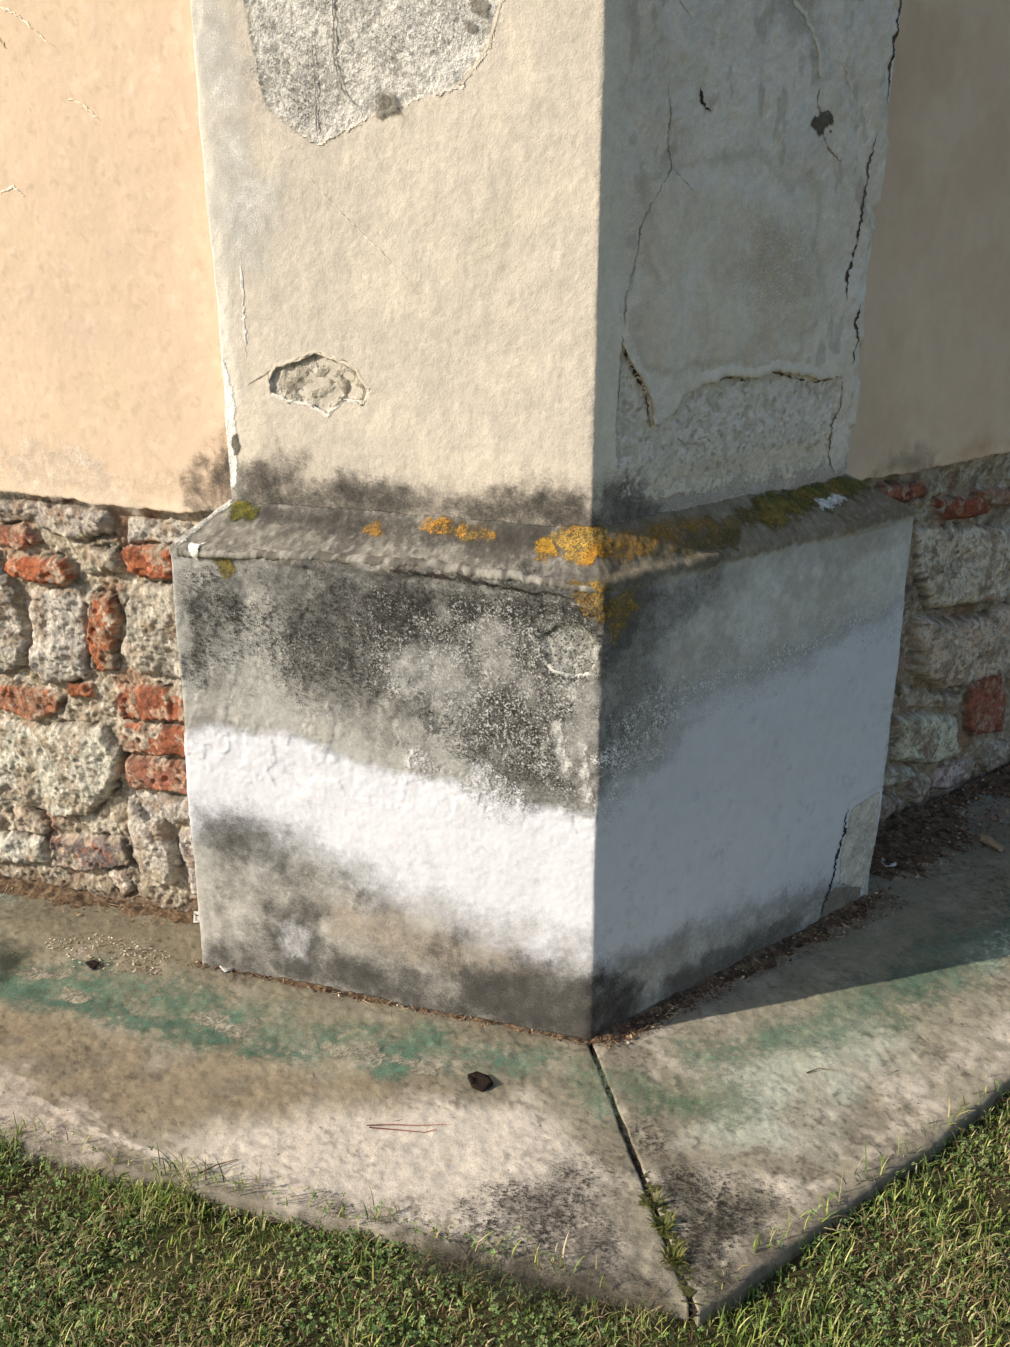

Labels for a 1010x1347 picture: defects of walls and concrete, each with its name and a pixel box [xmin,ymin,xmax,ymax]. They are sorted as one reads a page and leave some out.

spalling [243,0,505,145]
crack [887,0,902,105]
crack [624,84,711,327]
crack [845,135,877,363]
spalling [173,349,599,599]
peeling [615,335,844,502]
water stain [177,454,847,817]
crack [821,793,880,917]
water stain [212,893,823,1052]